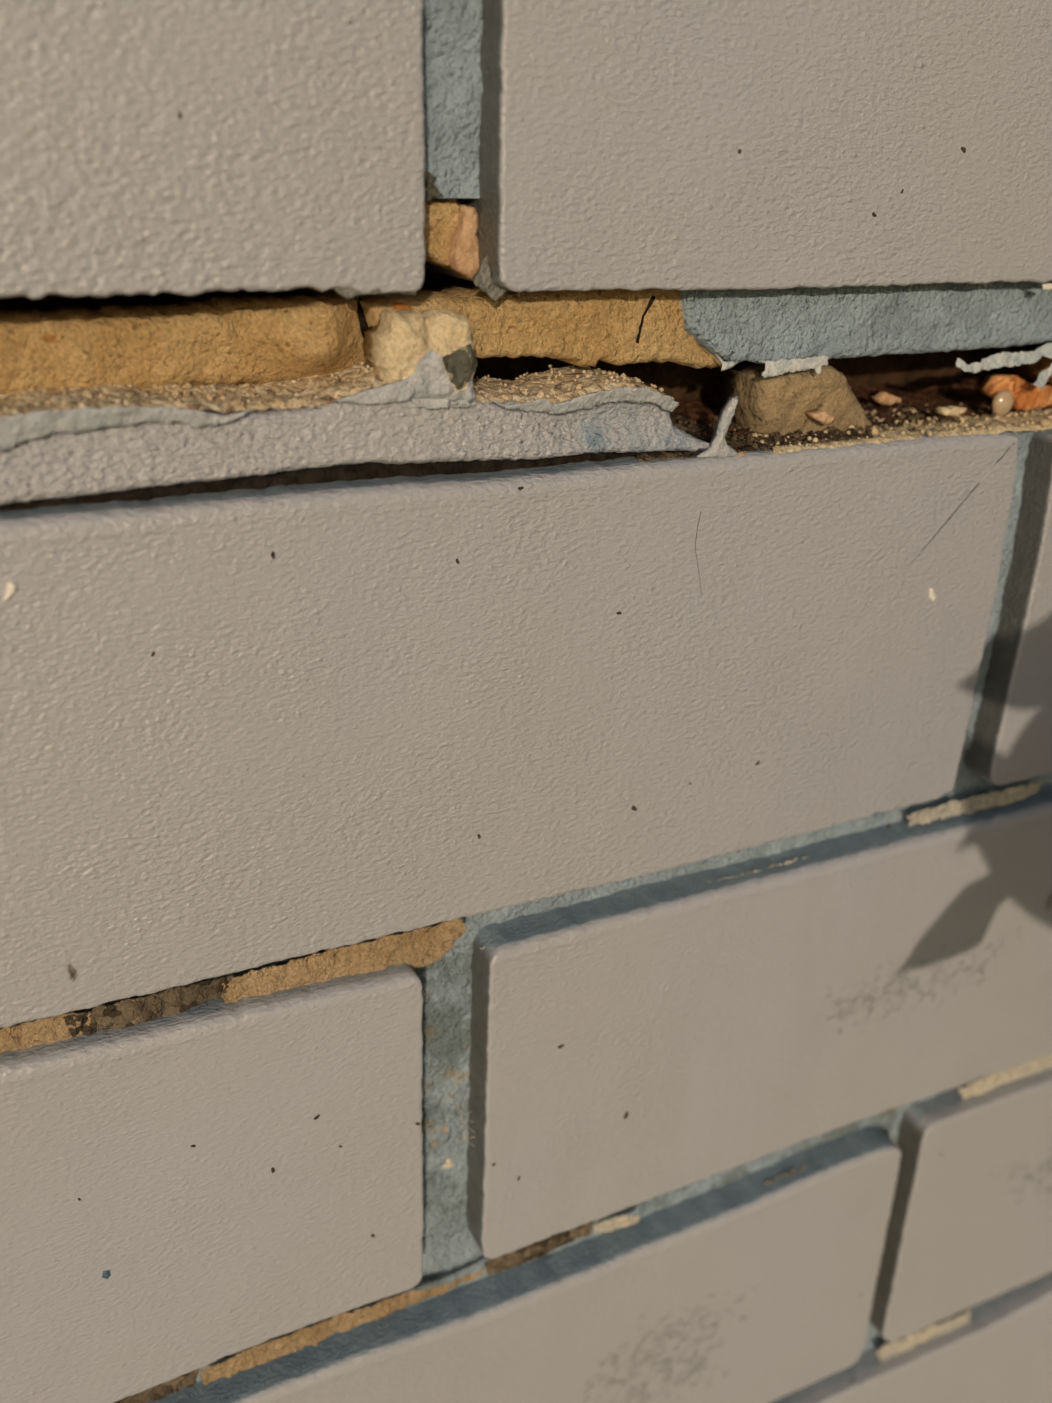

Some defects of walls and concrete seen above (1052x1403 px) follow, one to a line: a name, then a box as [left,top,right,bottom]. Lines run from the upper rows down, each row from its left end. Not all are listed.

spalling [0,172,738,394]
peeling [758,355,828,378]
peeling [956,343,1052,389]
spalling [805,409,835,425]
spalling [868,391,902,405]
peeling [221,918,466,1003]
peeling [0,1012,92,1053]
peeling [592,1215,640,1234]
peeling [200,1267,486,1385]